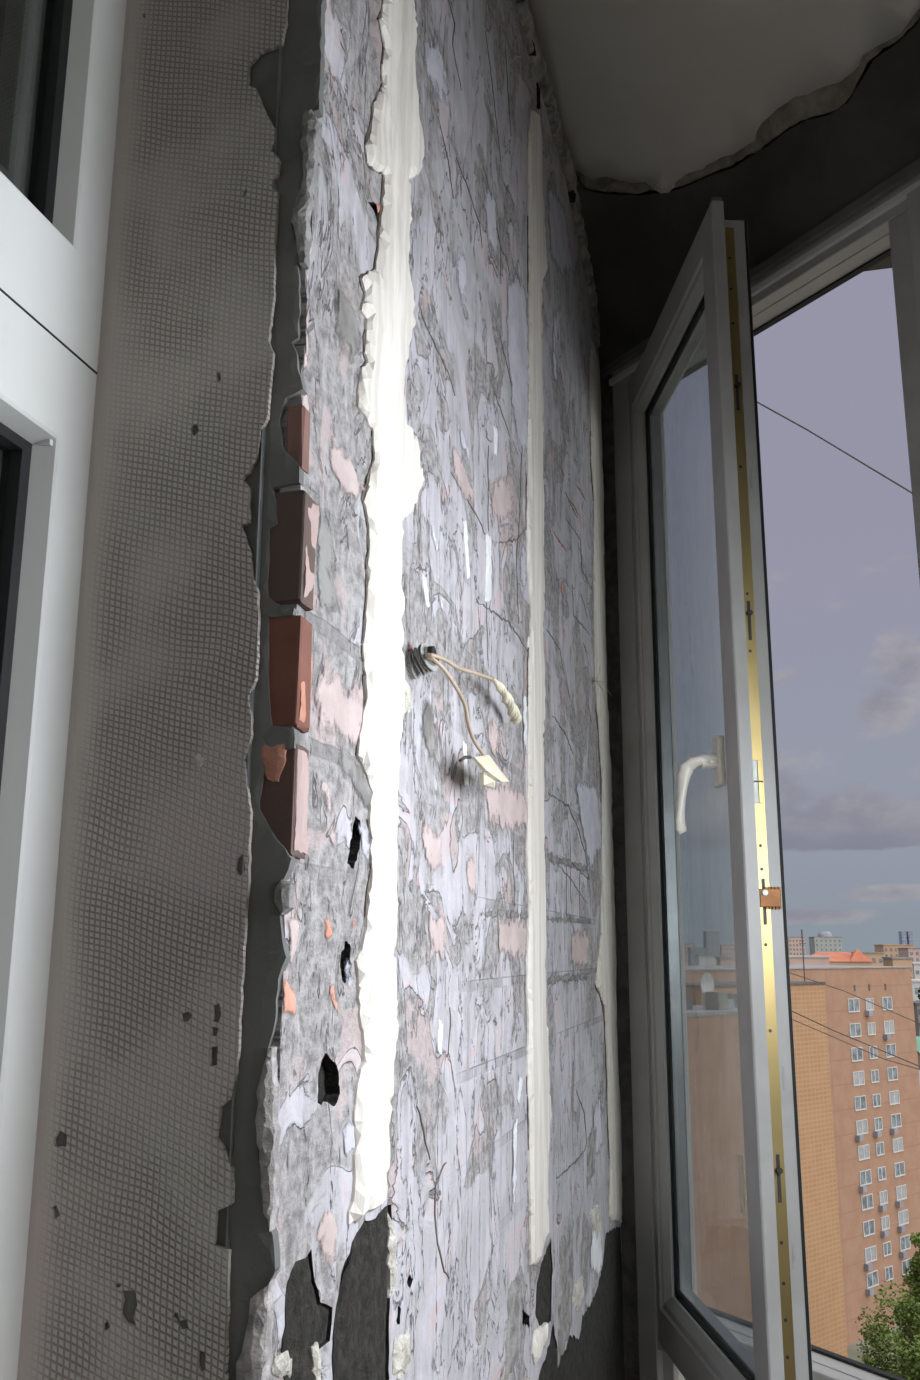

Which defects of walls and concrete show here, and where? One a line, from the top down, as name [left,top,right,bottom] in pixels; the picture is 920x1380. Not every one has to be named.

crack [438,0,512,279]
flaking render [568,8,920,203]
crack [420,312,455,396]
crack [451,336,593,671]
crack [510,828,518,906]
crack [548,792,589,917]
crack [445,1007,453,1055]
crack [416,1106,450,1279]
crack [556,1090,587,1179]
flaking render [587,1124,597,1186]
flaking render [281,1205,388,1380]
flaking render [504,1210,624,1380]